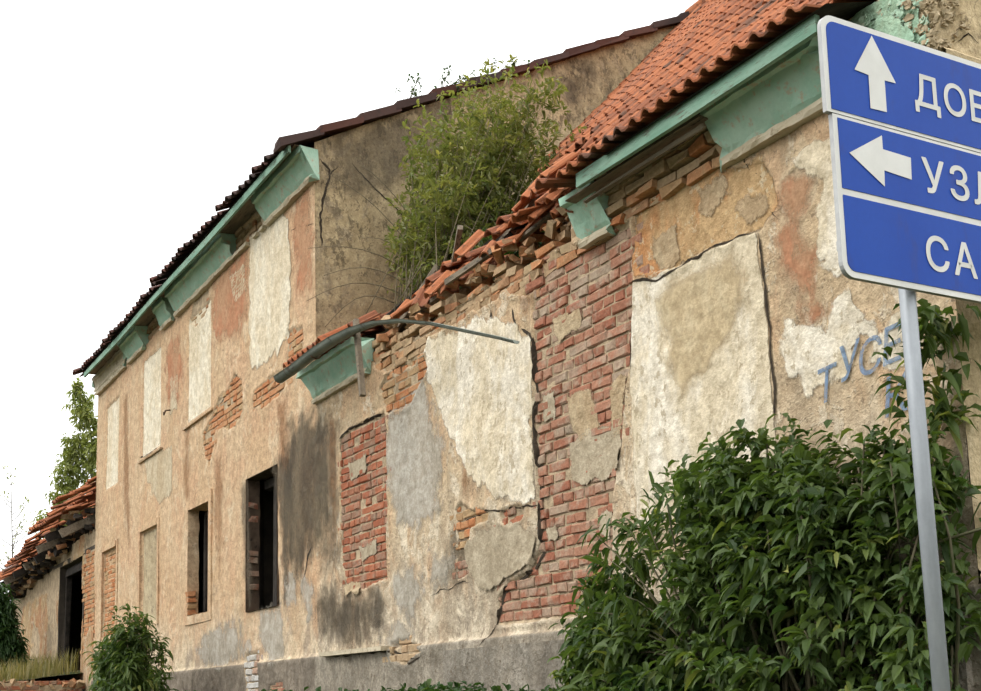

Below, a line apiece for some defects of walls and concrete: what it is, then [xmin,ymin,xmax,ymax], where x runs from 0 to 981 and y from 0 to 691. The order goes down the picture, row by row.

peeling [850,0,971,52]
crack [293,160,402,243]
peeling [192,192,314,368]
crack [632,231,776,419]
peeling [165,337,182,414]
spalling [199,377,293,465]
peeling [337,137,904,663]